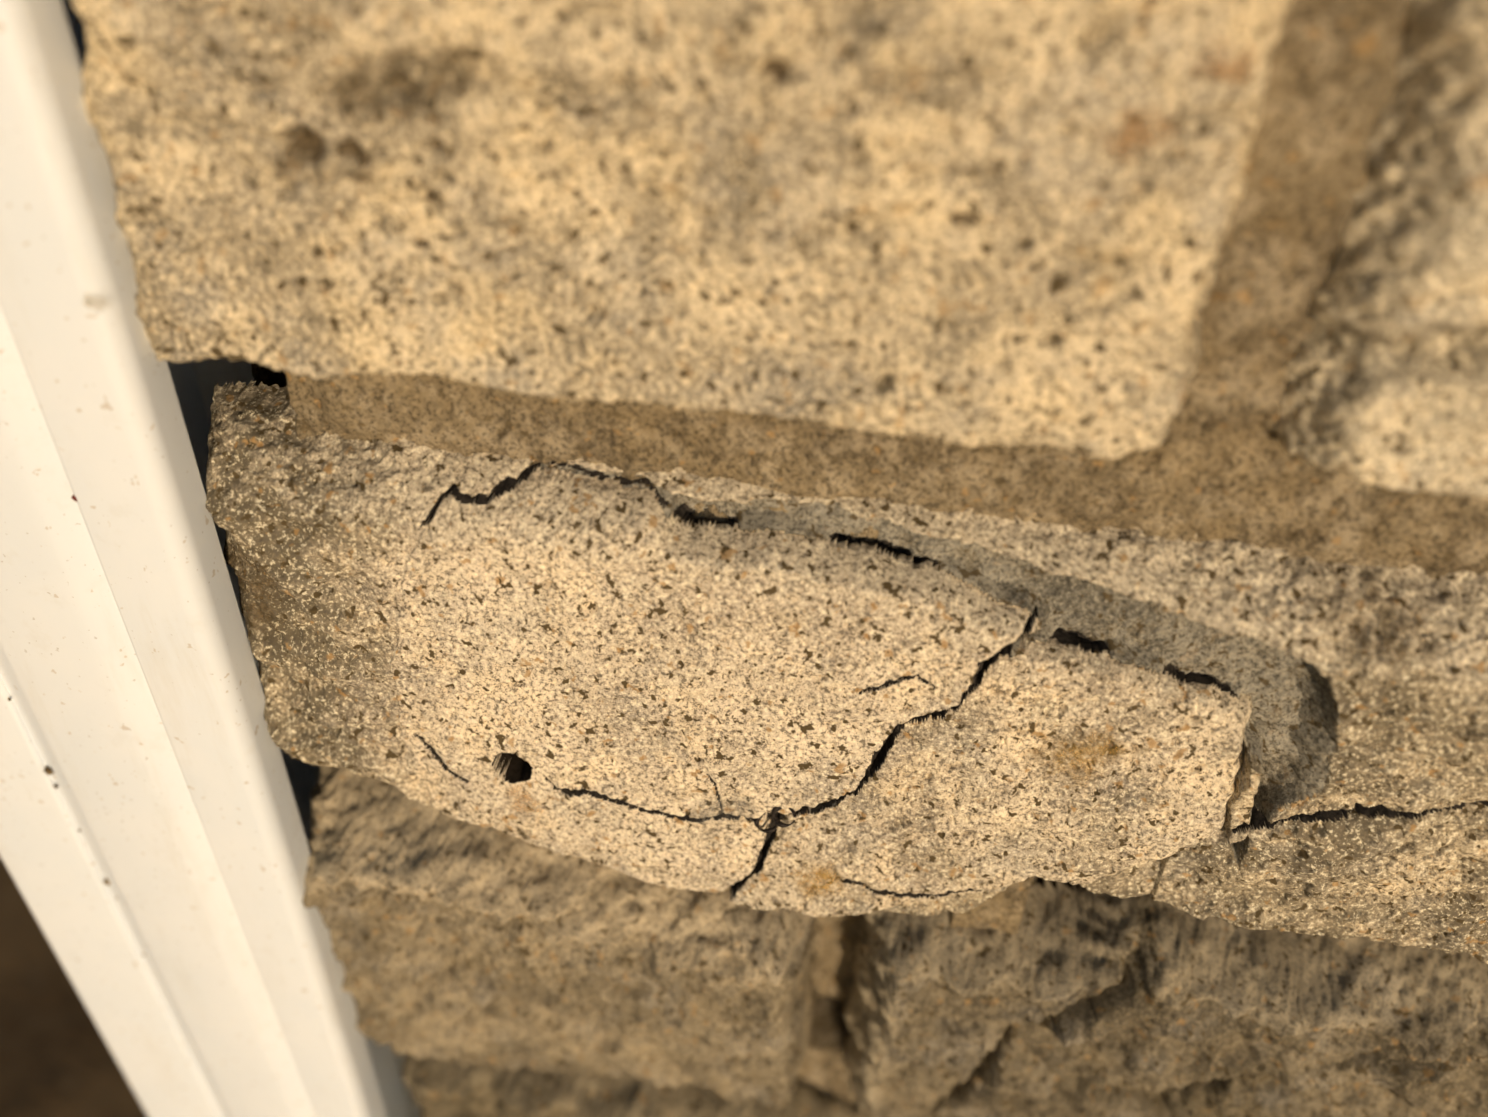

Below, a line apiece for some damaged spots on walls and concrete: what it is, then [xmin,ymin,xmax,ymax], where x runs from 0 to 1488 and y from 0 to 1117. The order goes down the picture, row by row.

crack [420,461,669,527]
crack [415,734,469,783]
crack [545,606,1038,899]
spalling [390,463,1339,917]